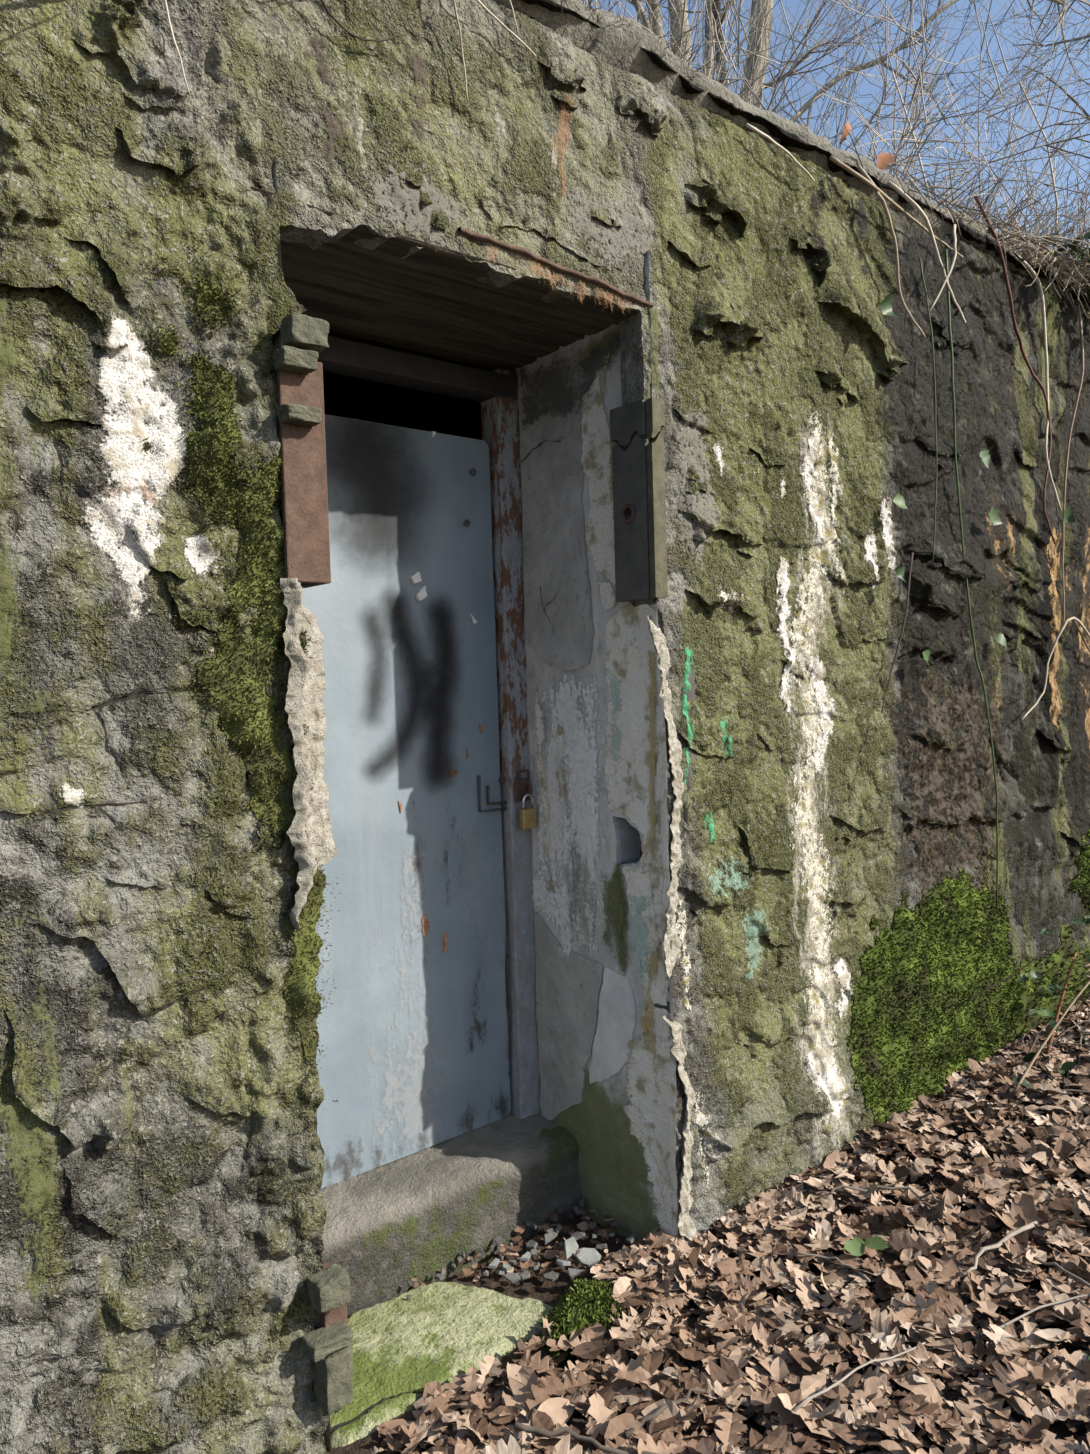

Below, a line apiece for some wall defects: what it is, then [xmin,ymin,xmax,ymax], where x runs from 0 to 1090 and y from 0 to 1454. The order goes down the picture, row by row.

water stain [792,165,831,291]
water stain [83,316,186,622]
water stain [184,535,224,578]
peeling [294,603,338,869]
flaking render [518,355,800,1120]
flaking render [780,637,805,679]
water stain [776,412,854,1152]
flaking render [821,866,871,917]
water stain [845,184,1023,969]